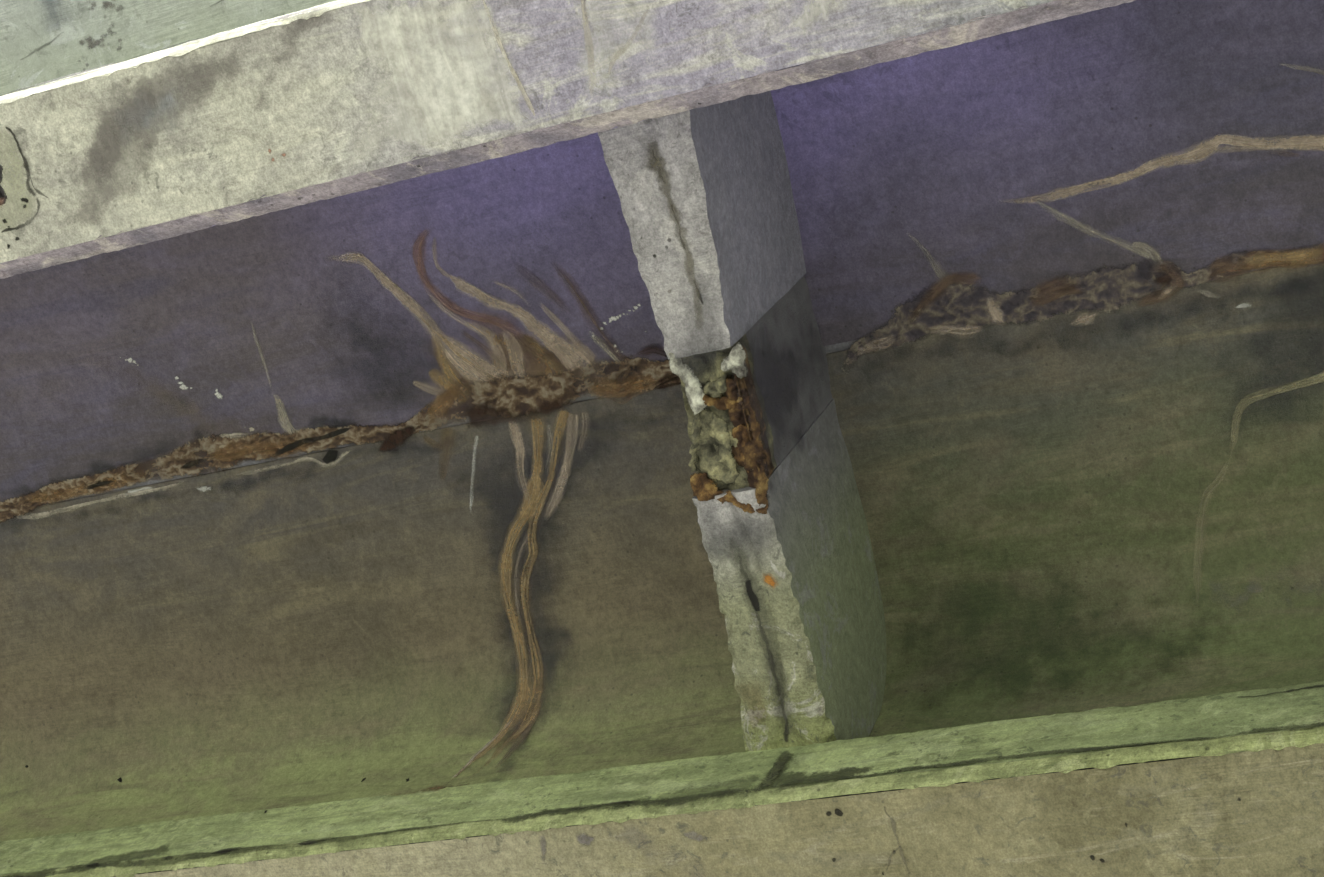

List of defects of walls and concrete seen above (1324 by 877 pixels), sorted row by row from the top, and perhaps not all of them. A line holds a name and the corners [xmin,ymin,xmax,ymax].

spalling [0,165,28,248]
rust [353,258,591,392]